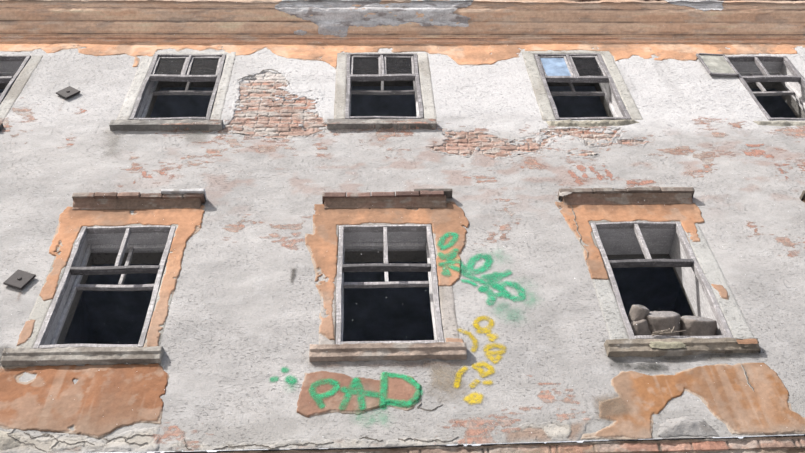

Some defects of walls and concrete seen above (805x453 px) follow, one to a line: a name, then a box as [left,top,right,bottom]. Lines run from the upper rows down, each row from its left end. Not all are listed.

peeling [0,0,805,69]
flaking render [125,70,653,189]
flaking render [654,144,805,179]
peeling [39,205,205,347]
peeling [222,200,469,340]
peeling [555,202,704,280]
peeling [711,284,730,300]
peeling [17,320,36,346]
crack [7,428,154,452]
crack [184,439,334,451]
peeling [0,363,805,453]
crack [359,435,457,443]